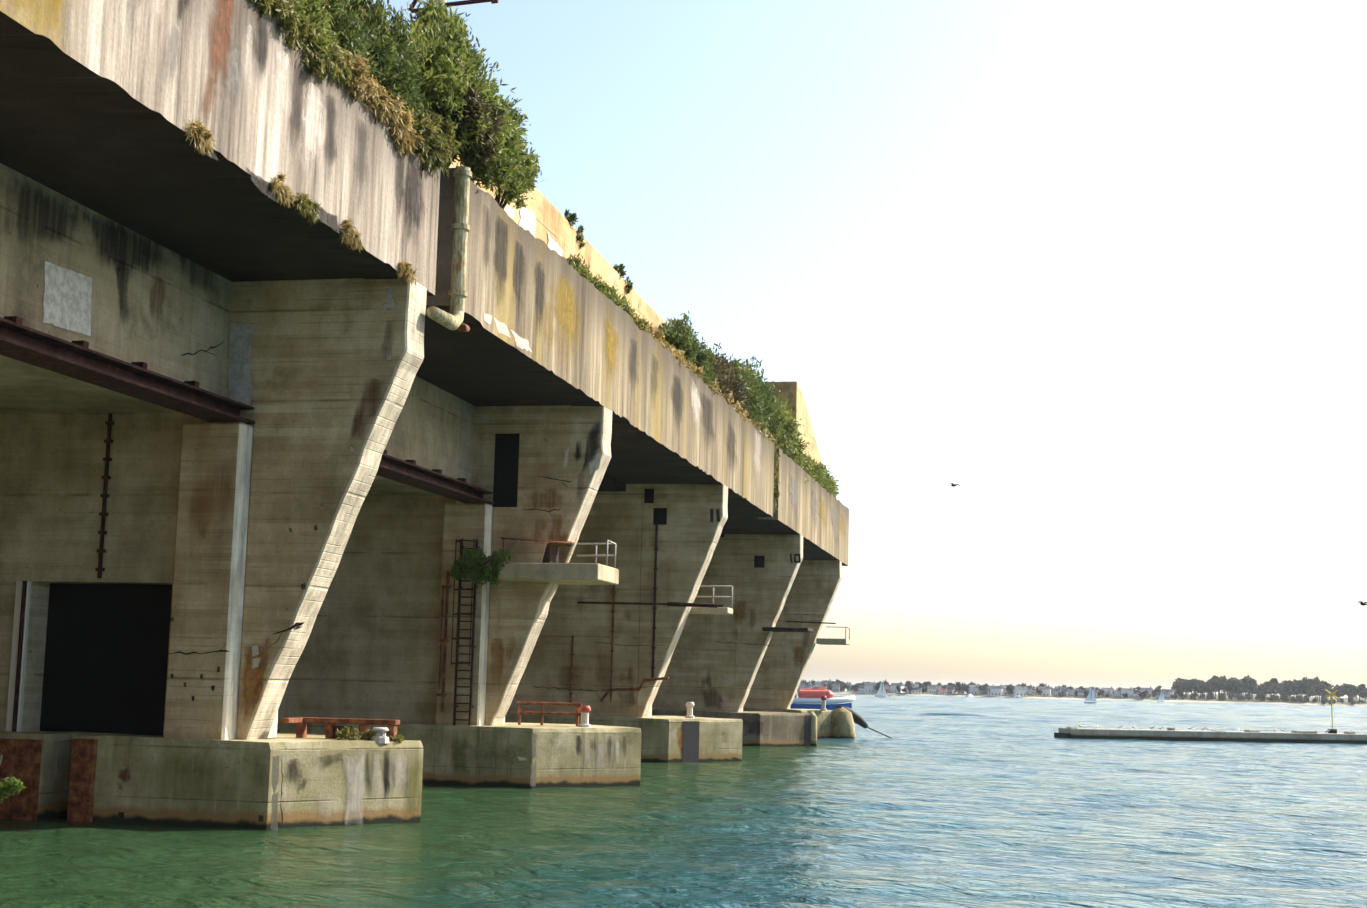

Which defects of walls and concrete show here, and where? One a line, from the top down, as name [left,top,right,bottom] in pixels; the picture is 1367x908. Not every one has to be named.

corrosion [206,0,234,112]
leakage [495,220,575,340]
leakage [607,323,637,378]
leakage [673,378,713,436]
leakage [576,424,599,469]
corrosion [243,640,268,715]